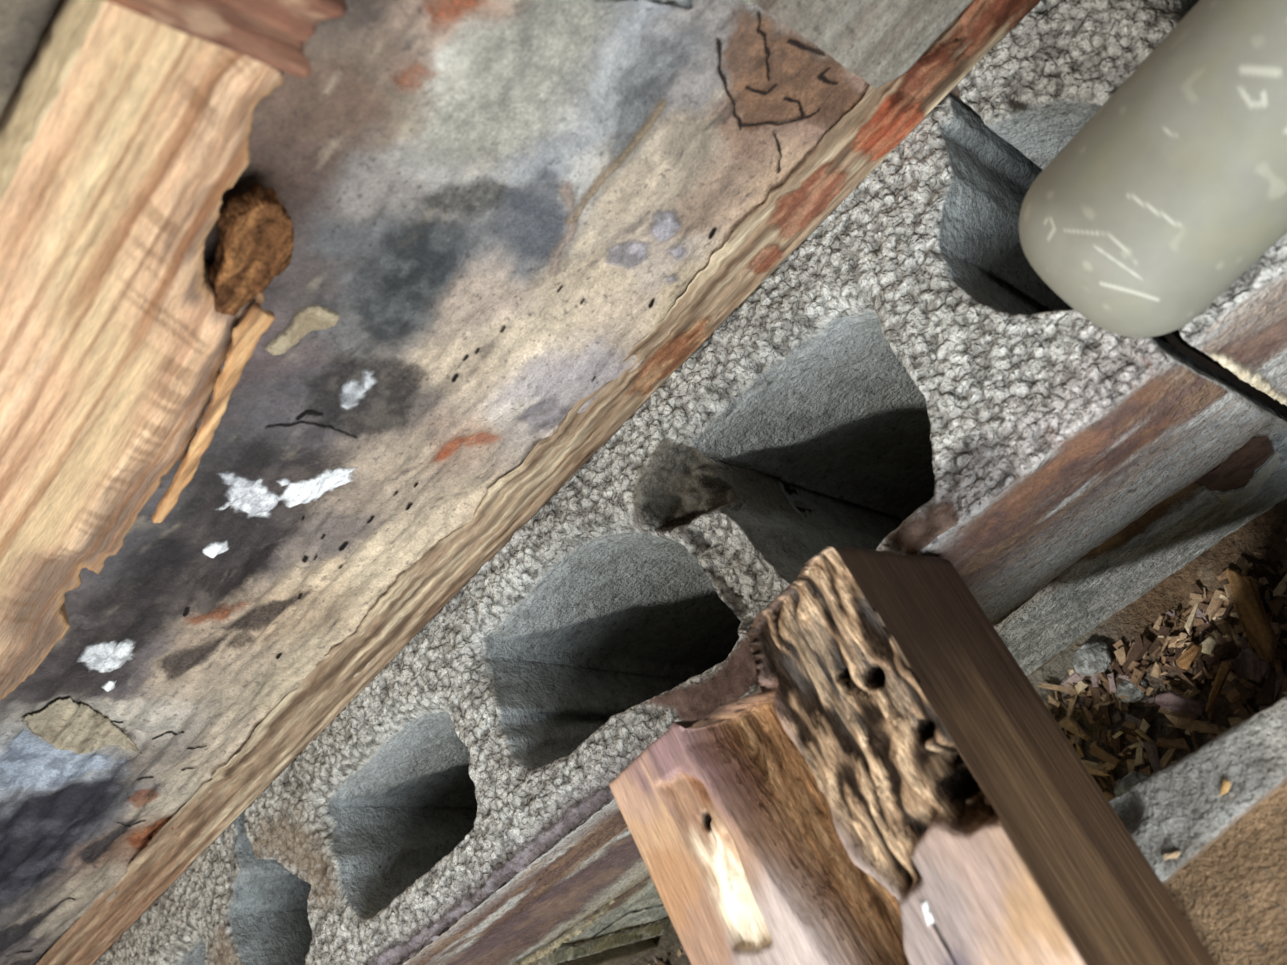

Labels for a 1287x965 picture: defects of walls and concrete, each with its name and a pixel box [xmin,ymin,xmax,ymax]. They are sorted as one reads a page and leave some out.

leakage [612,29,701,163]
leakage [352,175,564,340]
leakage [606,212,687,284]
corrosion [748,164,849,274]
leakage [312,359,422,436]
leakage [517,400,569,432]
leakage [59,441,353,694]
leakage [645,638,759,721]
leakage [0,760,156,907]
leakage [0,899,66,965]
leakage [440,835,650,965]
crack [931,923,956,965]